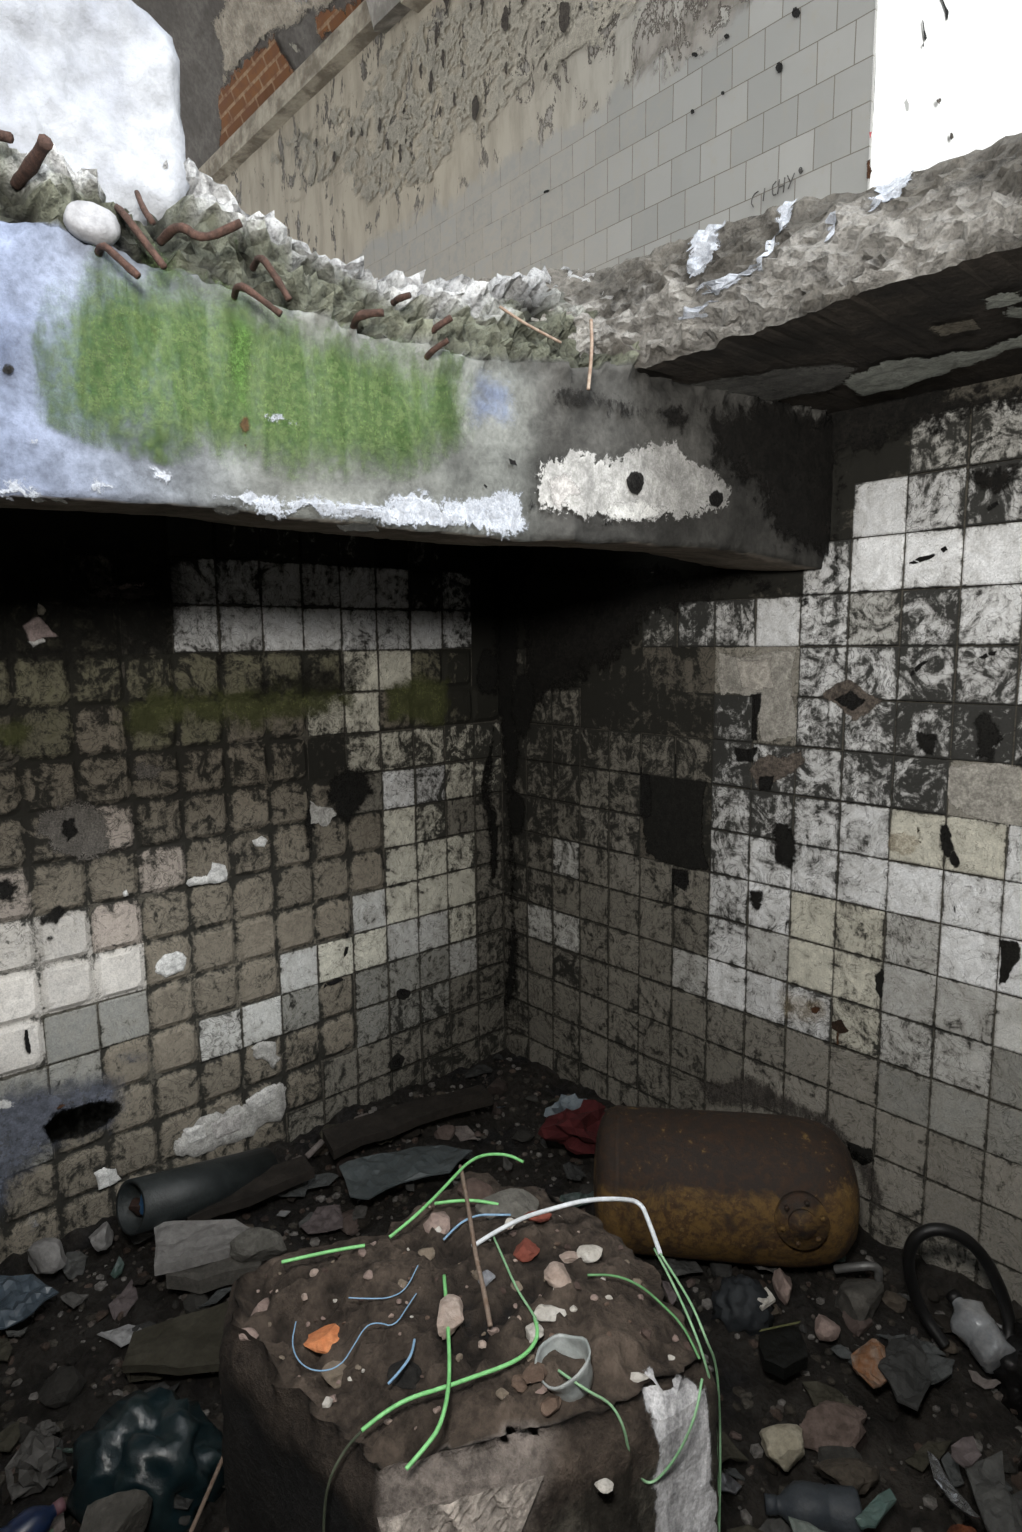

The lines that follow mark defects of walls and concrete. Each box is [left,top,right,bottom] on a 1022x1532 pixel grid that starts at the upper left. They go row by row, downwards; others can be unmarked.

peeling [212,0,364,147]
peeling [270,0,641,210]
spalling [10,134,54,190]
peeling [690,290,1022,401]
leakage [0,478,40,501]
leakage [91,477,113,494]
leakage [150,466,172,483]
flaking render [530,439,732,523]
peeling [947,763,1022,827]
peeling [630,754,710,911]
spalling [94,1167,121,1190]
spalling [377,1476,544,1532]